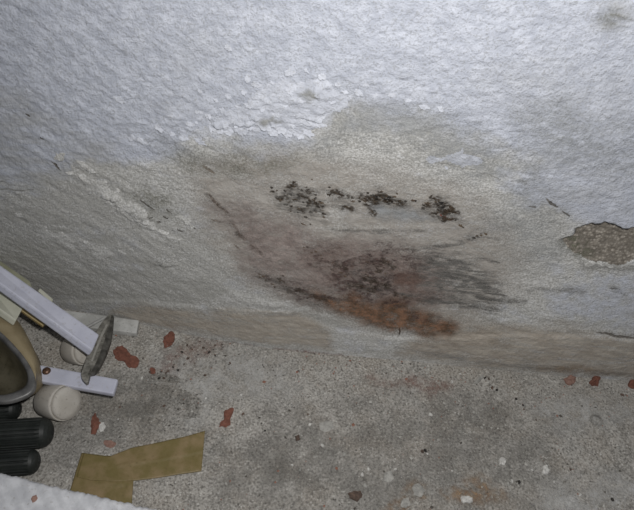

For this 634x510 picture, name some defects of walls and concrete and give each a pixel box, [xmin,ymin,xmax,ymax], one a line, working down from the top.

leakage [198,159,525,326]
flaking render [563,222,634,271]
rust [321,296,501,344]